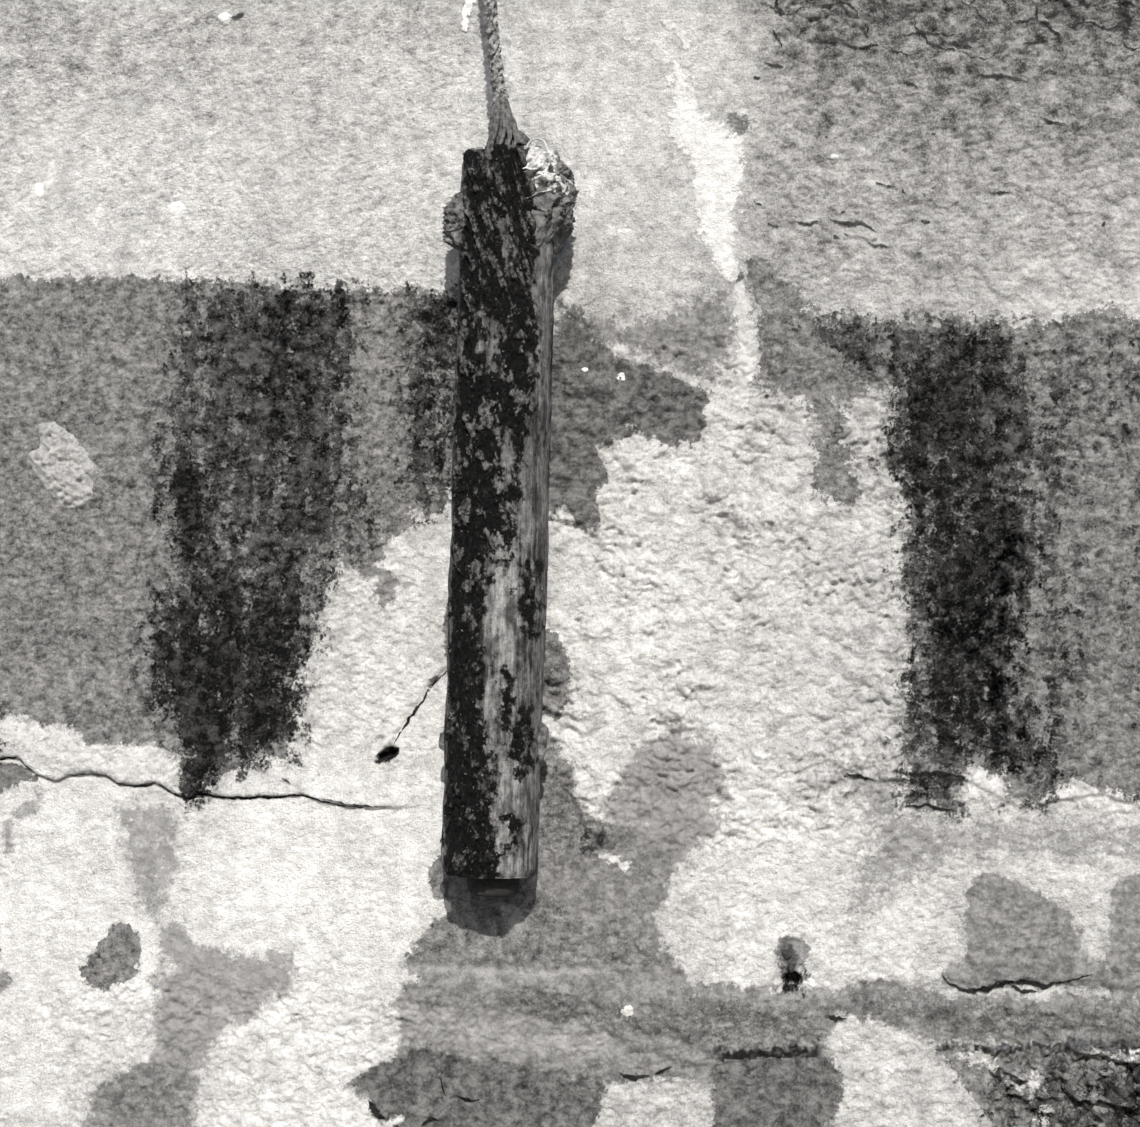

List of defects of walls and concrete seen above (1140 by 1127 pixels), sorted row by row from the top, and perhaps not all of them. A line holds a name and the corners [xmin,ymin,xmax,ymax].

crack [753,0,1140,89]
crack [1039,116,1067,125]
crack [754,201,888,248]
leakage [0,271,459,808]
leakage [347,13,1140,1127]
crack [375,671,447,764]
leakage [4,794,39,853]
leakage [121,799,179,910]
crack [0,757,384,808]
crack [942,974,1092,994]